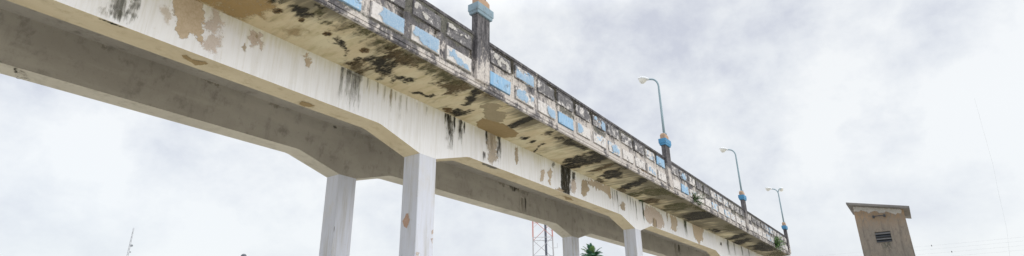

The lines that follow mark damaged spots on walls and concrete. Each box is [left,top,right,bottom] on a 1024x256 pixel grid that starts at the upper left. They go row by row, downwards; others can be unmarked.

water stain [110,0,140,19]
flaking render [173,0,224,65]
flaking render [242,31,263,51]
water stain [196,0,493,145]
flaking render [476,103,519,164]
flaking render [540,163,625,211]
water stain [507,116,784,256]
flaking render [644,206,677,231]